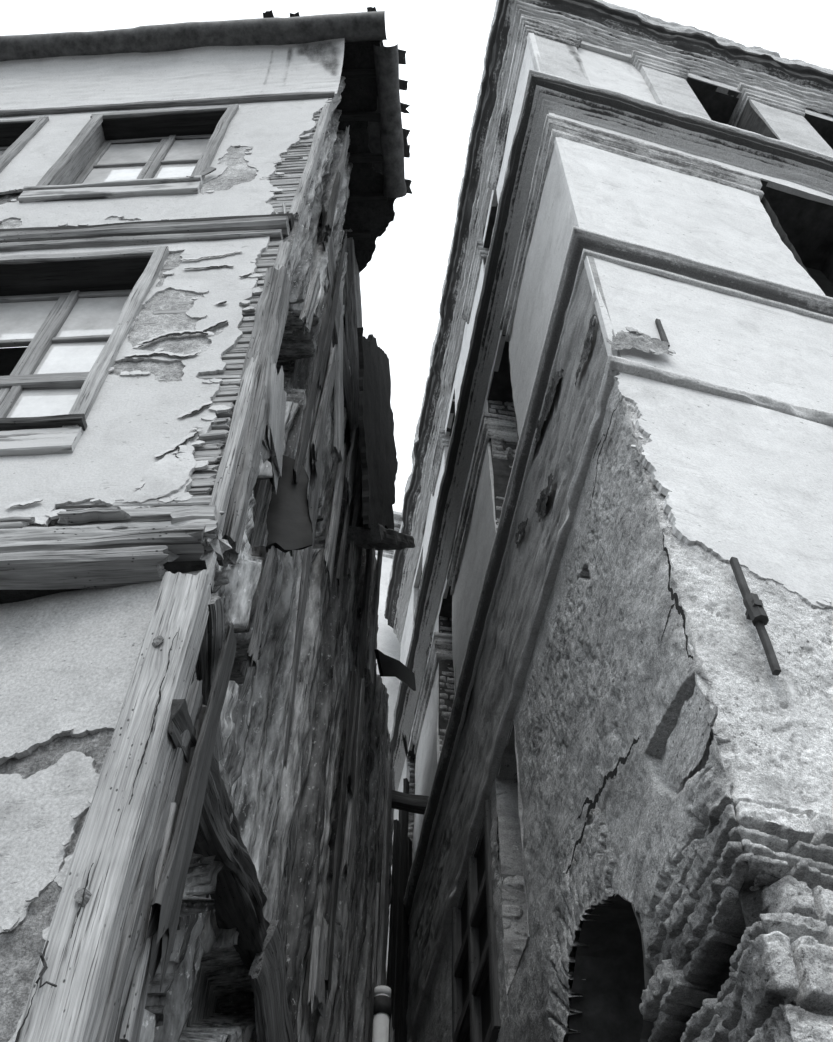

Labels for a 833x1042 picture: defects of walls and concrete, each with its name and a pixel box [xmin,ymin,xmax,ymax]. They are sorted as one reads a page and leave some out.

peeling [200,144,285,195]
peeling [108,252,228,382]
spalling [240,261,264,312]
spalling [201,405,233,421]
spalling [194,460,209,470]
spalling [515,473,553,546]
spalling [0,725,114,779]
spalling [661,686,718,789]
spalling [60,795,93,870]
crack [566,737,639,874]
spalling [0,881,62,1042]